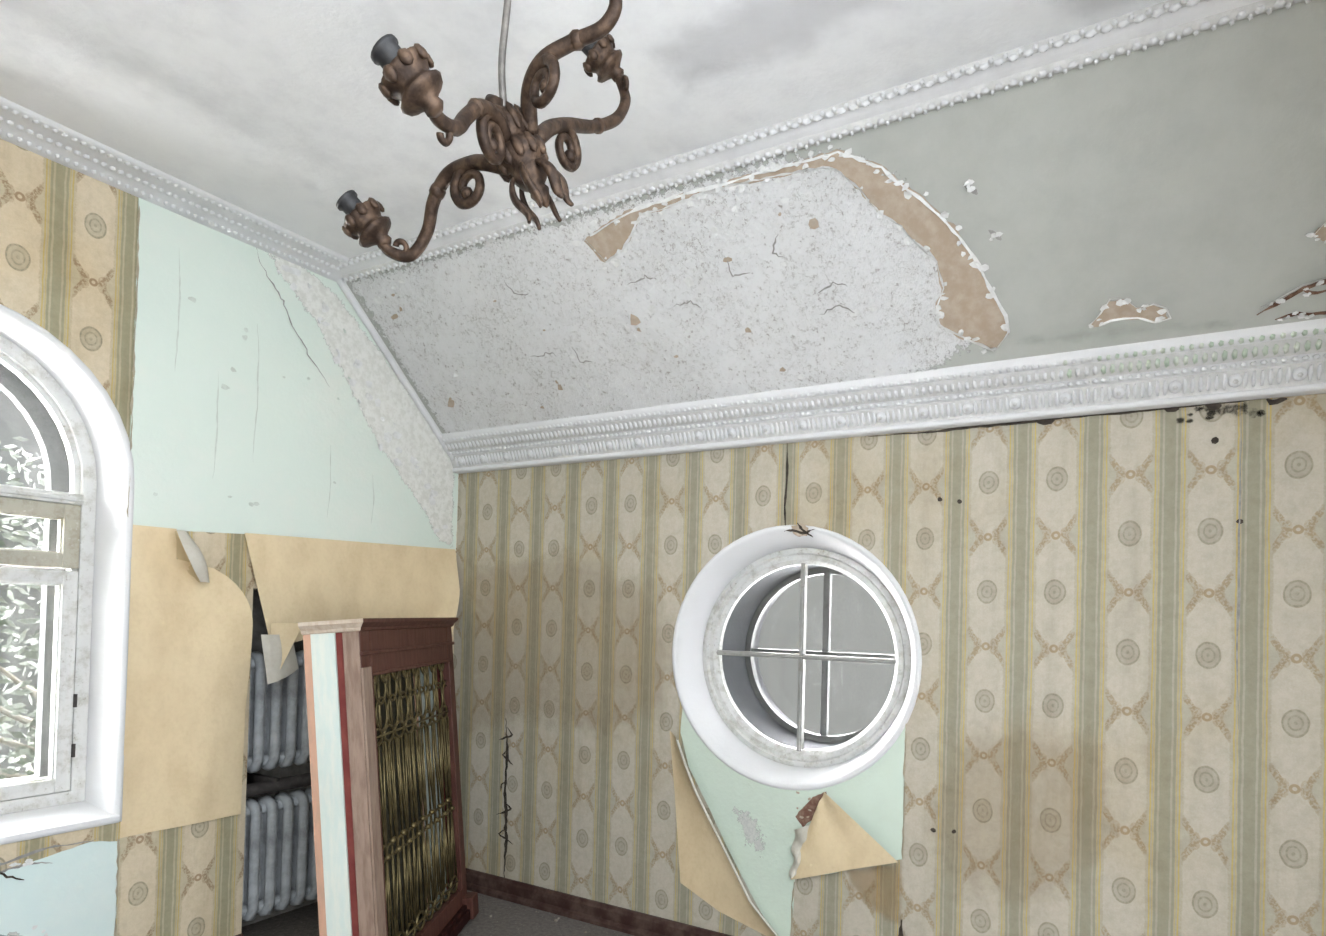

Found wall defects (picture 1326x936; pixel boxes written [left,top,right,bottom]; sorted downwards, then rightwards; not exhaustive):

peeling [127,145,1010,551]
peeling [0,839,120,936]
peeling [680,709,907,936]